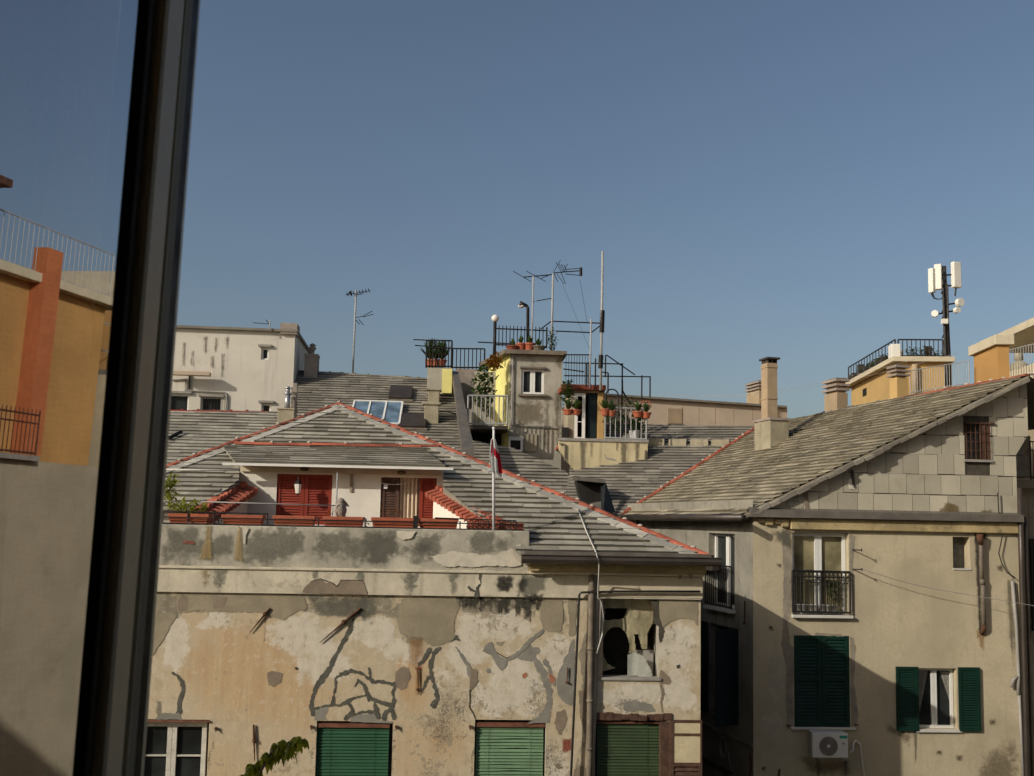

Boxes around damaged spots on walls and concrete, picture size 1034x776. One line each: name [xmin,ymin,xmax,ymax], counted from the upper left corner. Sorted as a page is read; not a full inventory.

leakage [163,525,303,586]
leakage [318,530,439,588]
leakage [471,532,506,552]
peeling [153,571,367,655]
crack [155,672,185,720]
crack [309,619,397,723]
crack [417,635,460,709]
peeling [398,596,680,735]